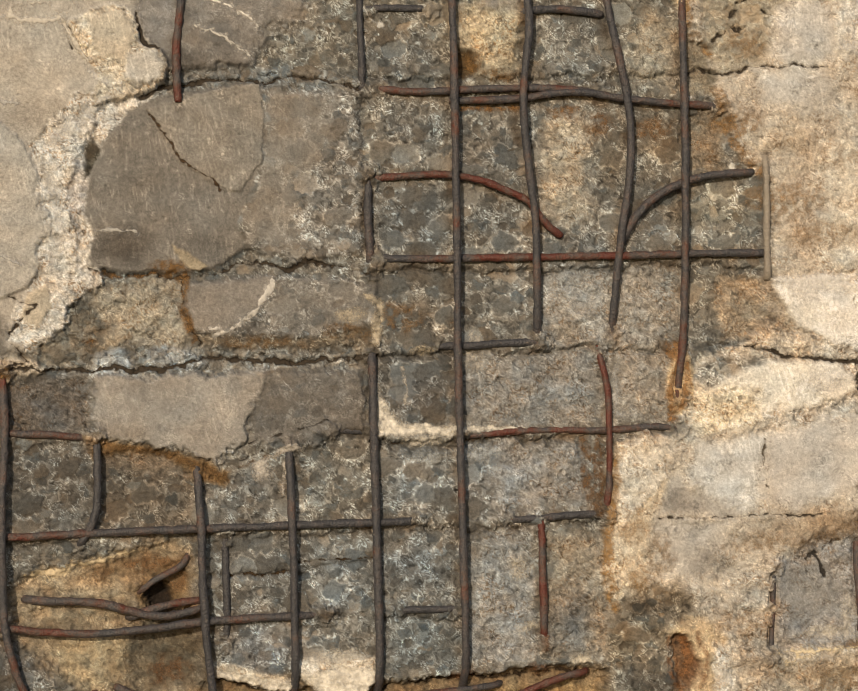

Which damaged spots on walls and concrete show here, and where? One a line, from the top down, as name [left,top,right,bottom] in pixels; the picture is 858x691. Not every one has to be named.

crack [135,12,160,49]
crack [194,24,251,56]
rust [464,55,511,81]
crack [711,0,766,43]
crack [687,63,823,76]
crack [138,75,359,192]
crack [0,256,379,375]
spalling [0,0,463,691]
spalling [427,0,858,691]
rust [666,342,692,421]
crack [709,342,858,390]
rust [580,434,621,611]